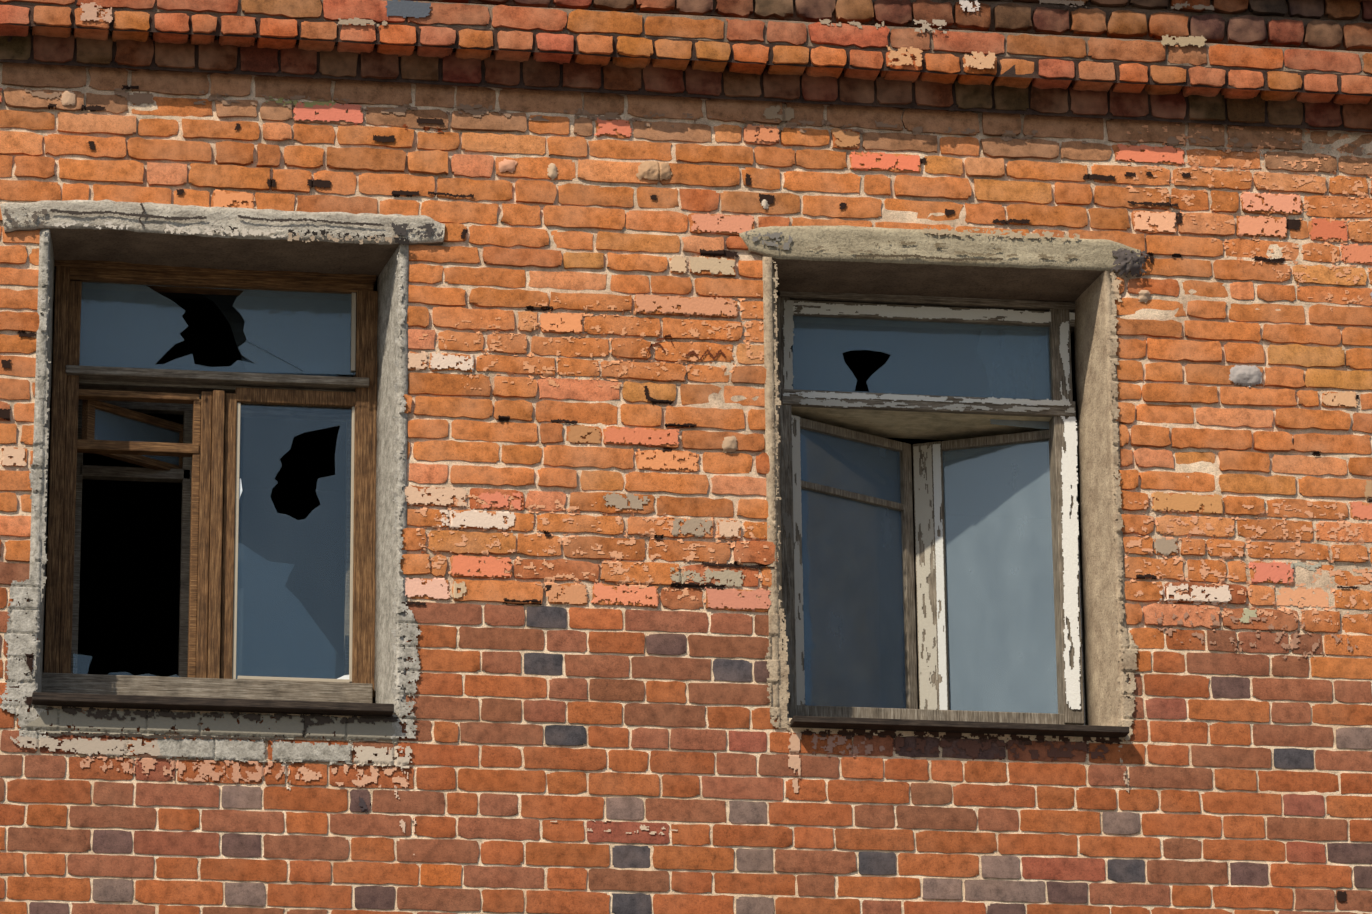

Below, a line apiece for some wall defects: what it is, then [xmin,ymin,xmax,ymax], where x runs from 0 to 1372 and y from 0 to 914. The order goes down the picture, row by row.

spalling [539,312,584,334]
spalling [408,351,475,373]
spalling [567,425,699,471]
spalling [405,486,467,508]
peeling [782,300,1081,710]
spalling [718,520,741,539]
spalling [1154,537,1179,556]
spalling [405,554,512,600]
spalling [544,583,659,606]
spalling [1249,560,1329,608]
spalling [705,565,794,705]